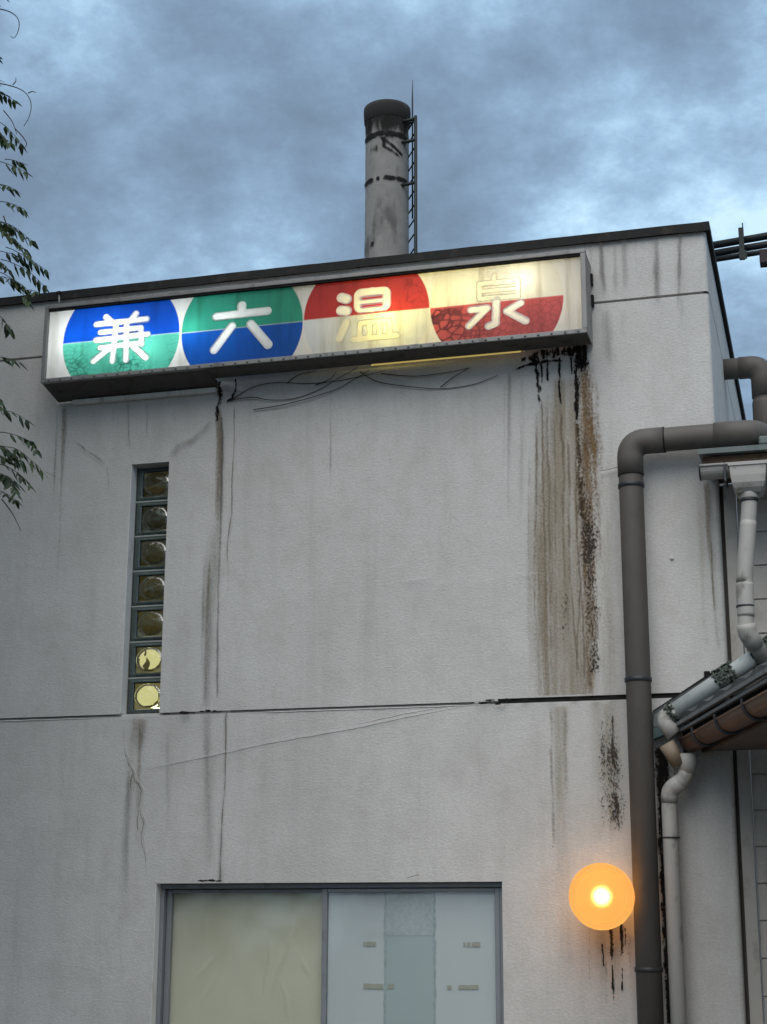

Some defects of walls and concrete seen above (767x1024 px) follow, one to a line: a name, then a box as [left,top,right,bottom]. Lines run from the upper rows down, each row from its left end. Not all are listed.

water stain [215,379,237,510]
rust [538,366,599,695]
crack [125,703,478,880]
water stain [599,714,626,836]
water stain [601,924,626,999]